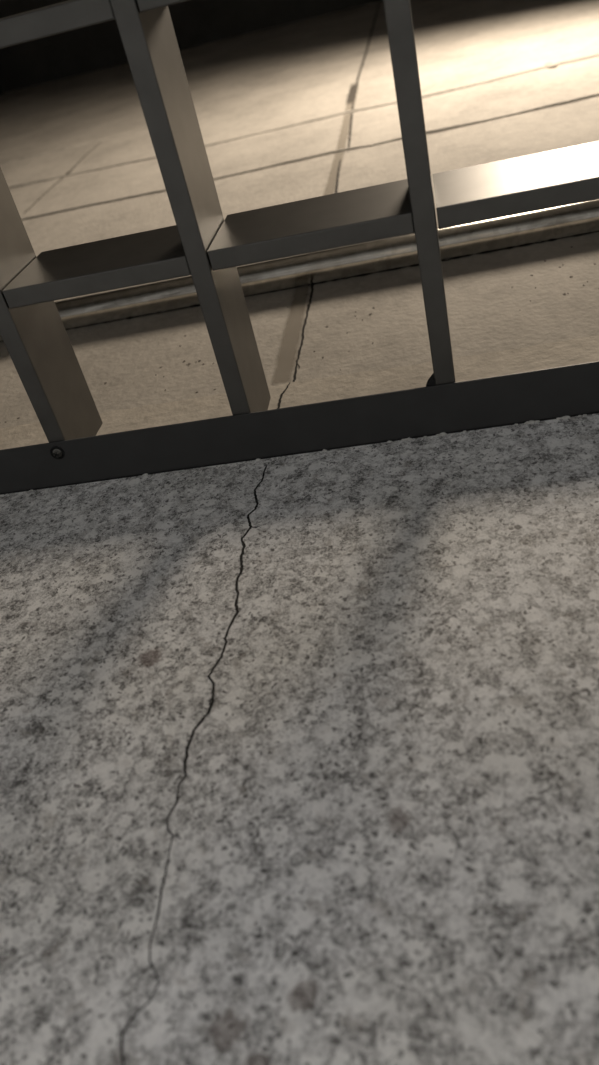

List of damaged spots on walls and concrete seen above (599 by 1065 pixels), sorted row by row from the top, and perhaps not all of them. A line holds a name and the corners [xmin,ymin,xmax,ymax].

crack [335,3,380,193]
crack [120,466,267,1065]